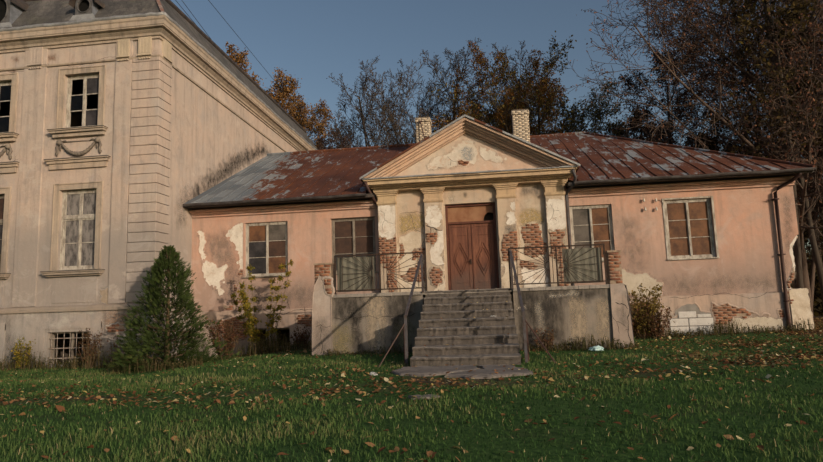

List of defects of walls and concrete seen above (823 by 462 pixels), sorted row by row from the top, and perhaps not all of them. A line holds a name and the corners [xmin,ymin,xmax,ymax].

flaking render [426,139,507,170]
flaking render [196,221,251,341]
flaking render [294,313,312,329]
flaking render [321,276,335,297]
flaking render [378,204,445,292]
flaking render [501,196,569,288]
flaking render [622,268,664,337]
flaking render [710,236,798,333]